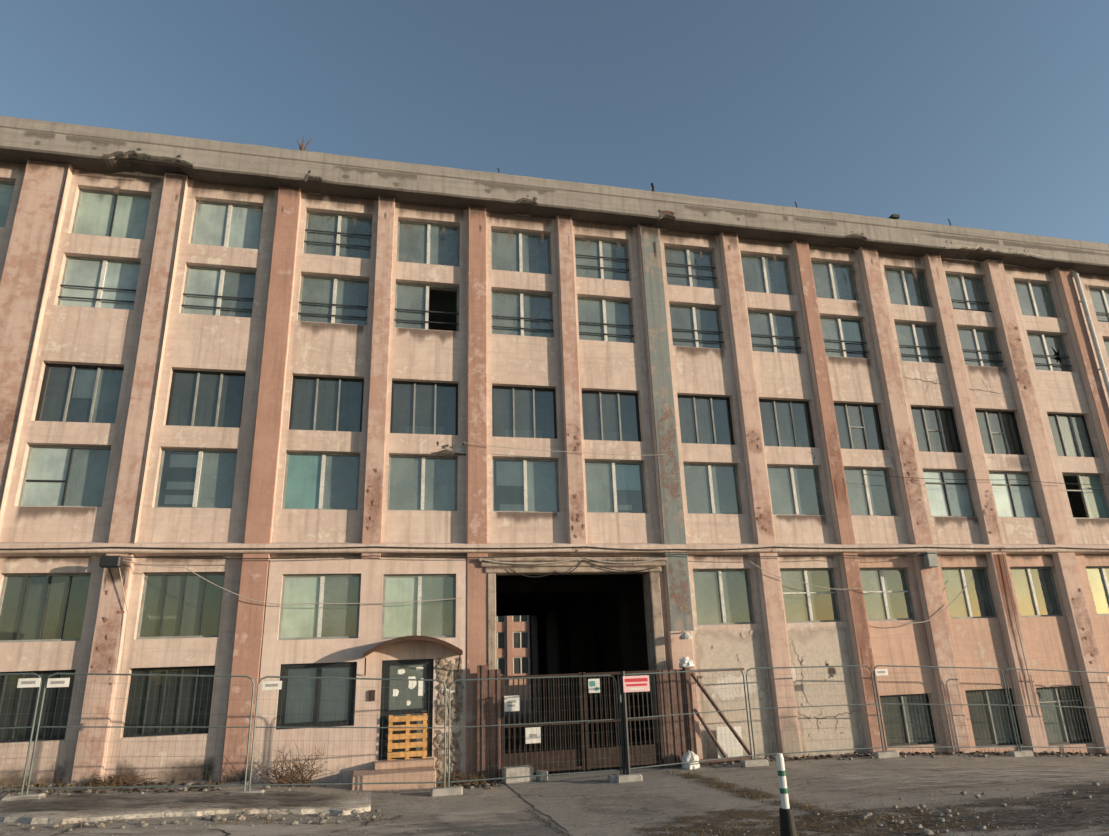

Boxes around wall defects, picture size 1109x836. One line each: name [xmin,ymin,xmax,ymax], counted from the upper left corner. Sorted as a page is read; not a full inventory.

spalling [103,148,193,168]
crack [792,644,853,730]